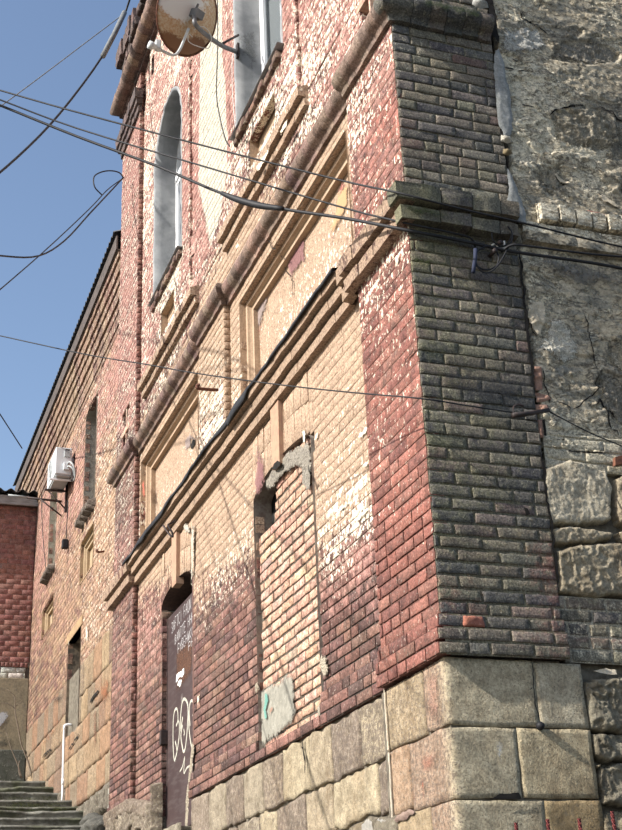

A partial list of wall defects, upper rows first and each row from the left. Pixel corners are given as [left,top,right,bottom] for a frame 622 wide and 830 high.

crack [518,250,619,435]
peeling [255,448,280,495]
crack [540,451,560,591]
crack [558,439,606,454]